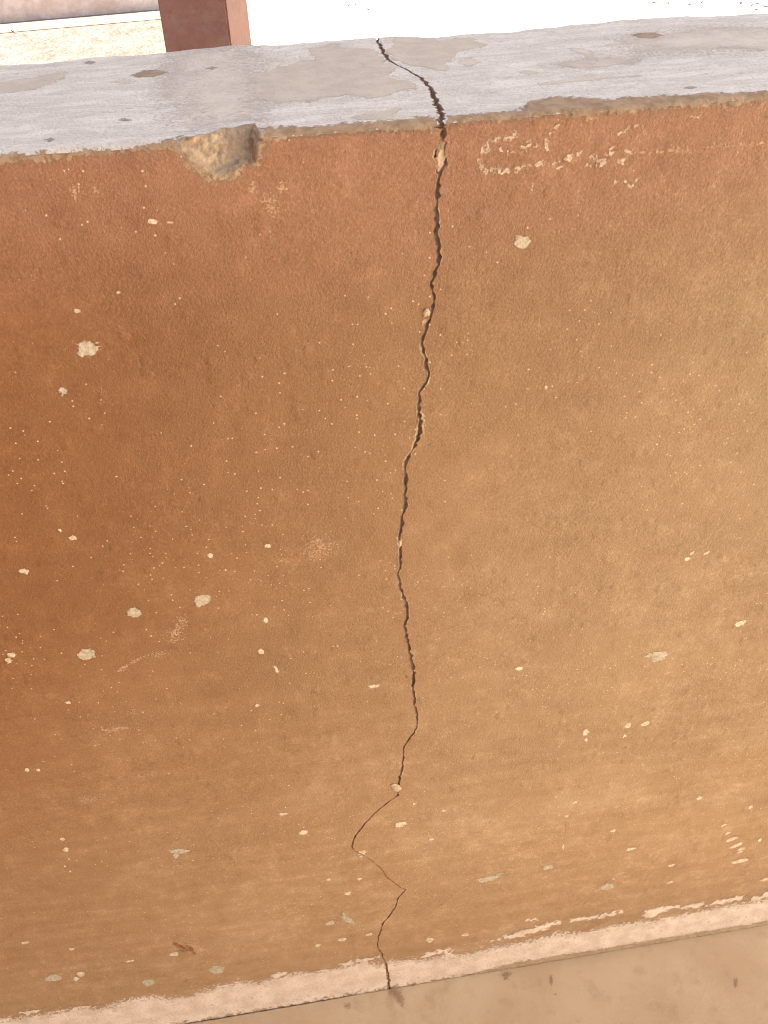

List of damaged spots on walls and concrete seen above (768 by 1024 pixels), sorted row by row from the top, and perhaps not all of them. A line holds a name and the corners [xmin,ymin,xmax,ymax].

peeling [111,36,488,186]
peeling [477,124,644,175]
peeling [77,340,101,357]
crack [351,38,448,989]